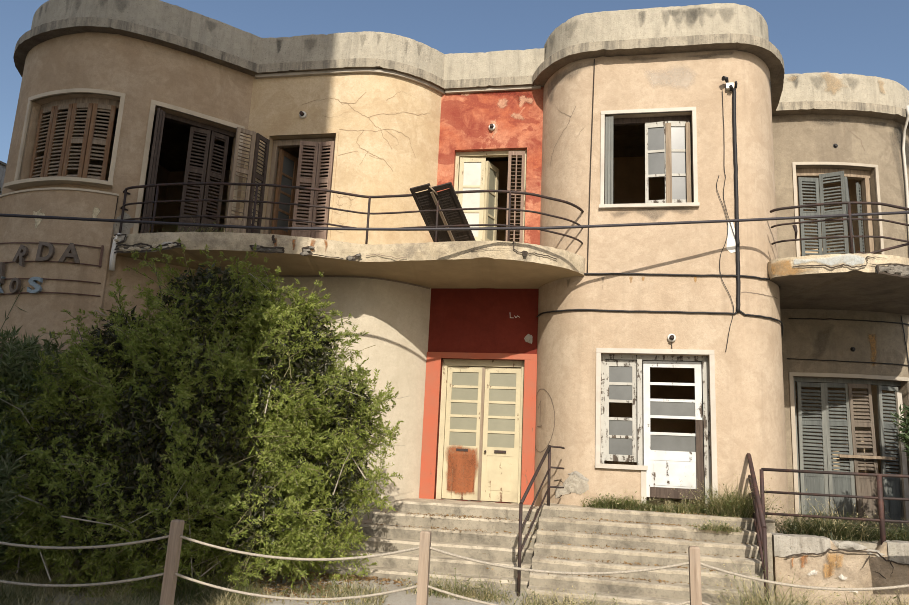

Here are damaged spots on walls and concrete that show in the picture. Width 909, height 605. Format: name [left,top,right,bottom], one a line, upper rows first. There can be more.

crack [302,91,427,171]
spalling [112,212,183,253]
spalling [250,245,285,253]
spalling [876,263,909,278]
peeling [555,471,589,498]
crack [785,548,909,579]